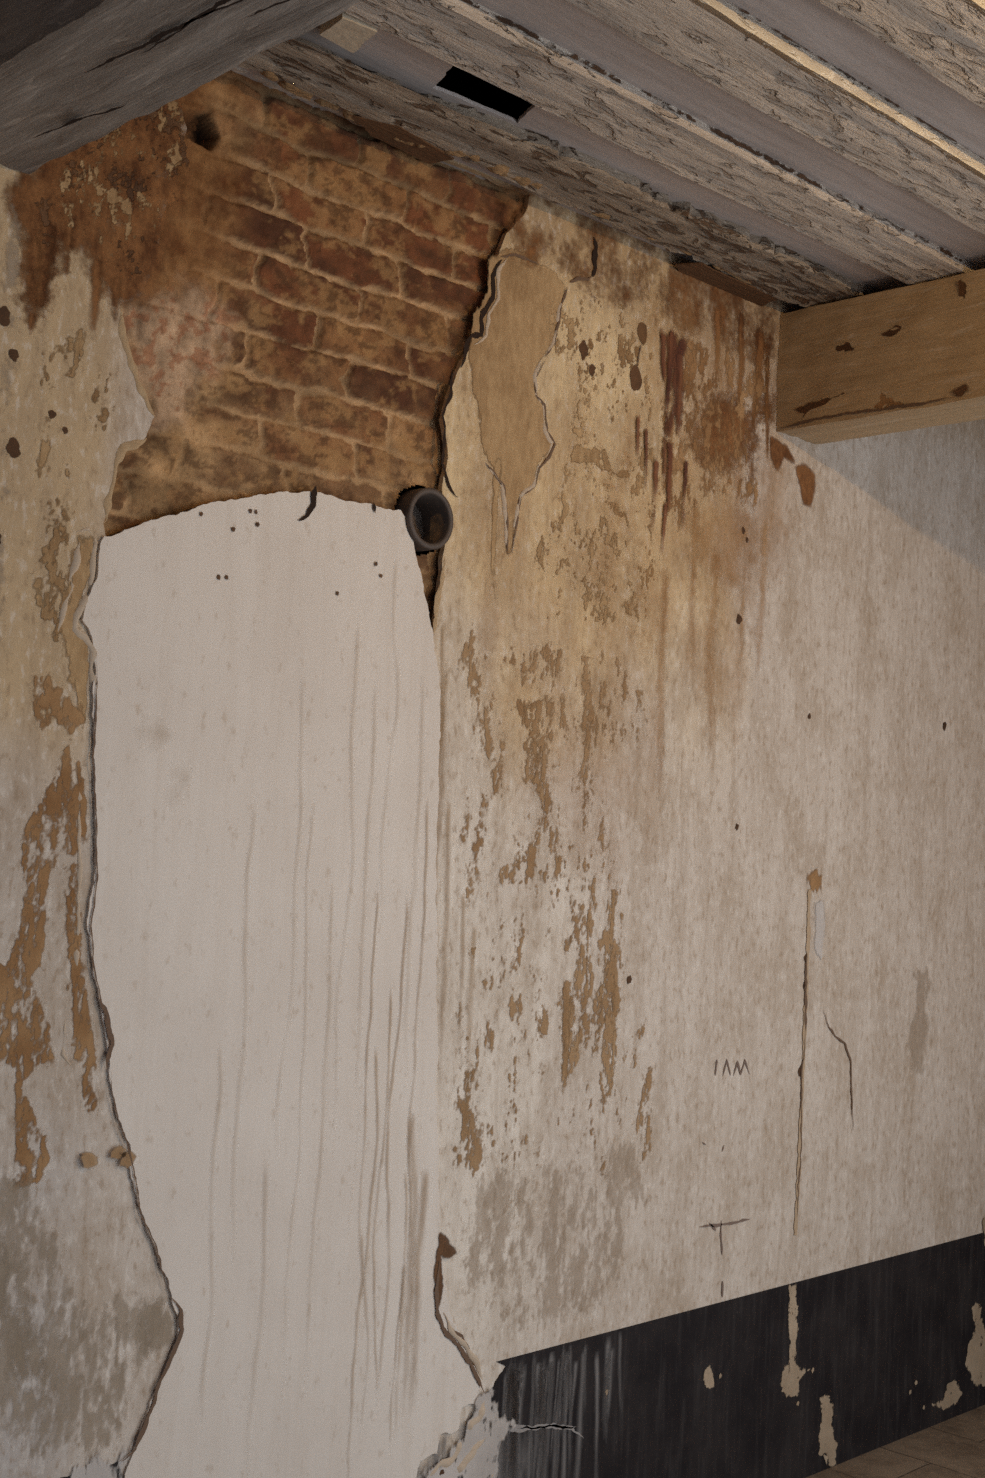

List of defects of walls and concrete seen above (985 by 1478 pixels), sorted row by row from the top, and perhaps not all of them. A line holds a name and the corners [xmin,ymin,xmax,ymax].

peeling [462,0,624,84]
crack [570,238,598,283]
leakage [507,185,665,304]
crack [441,253,540,497]
leakage [660,258,777,483]
spalling [0,70,822,1478]
spalling [909,1302,985,1410]
spalling [818,1395,838,1467]